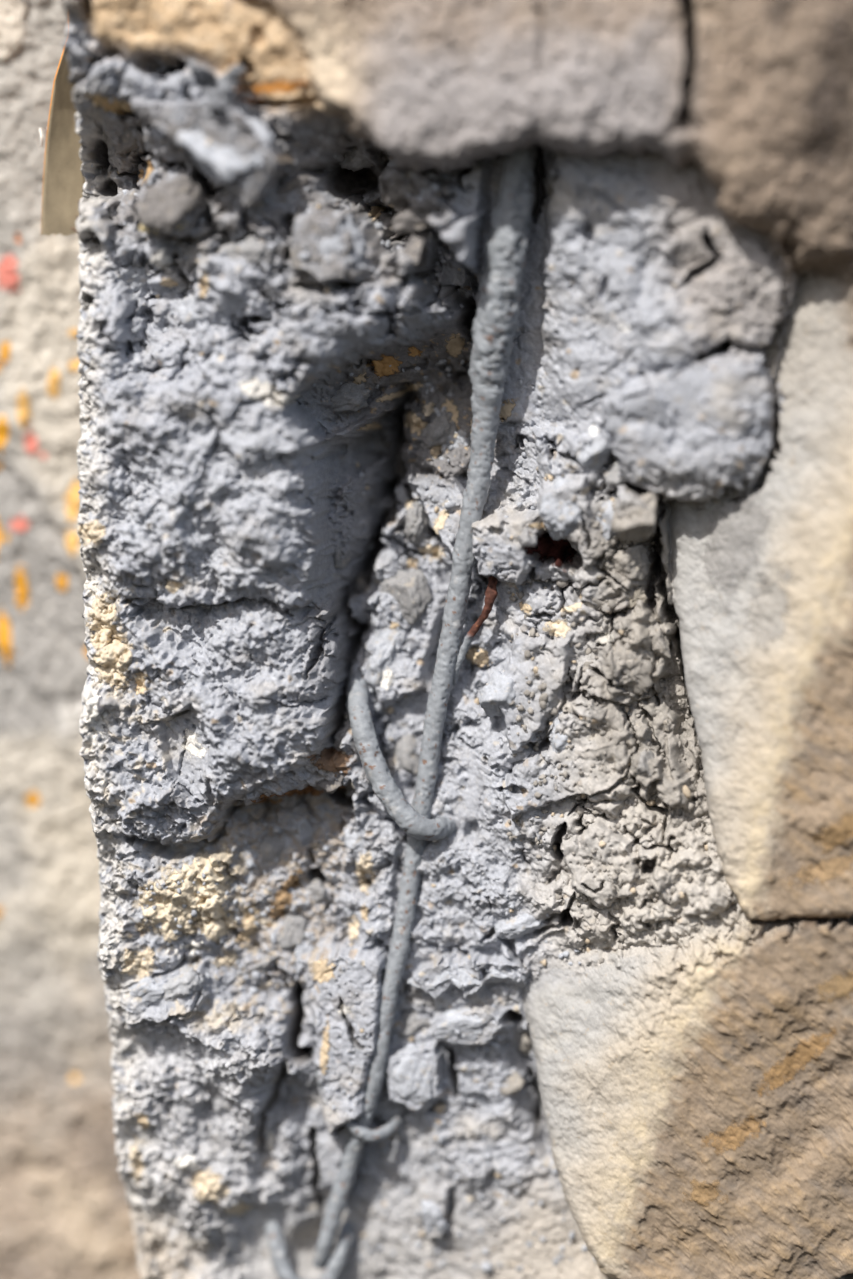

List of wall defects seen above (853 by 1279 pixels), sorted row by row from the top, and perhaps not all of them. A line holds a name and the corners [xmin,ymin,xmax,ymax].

crack [649,0,703,142]
spalling [63,0,738,1279]
crack [339,996,365,1052]
crack [256,1062,287,1157]
crack [309,1127,326,1213]